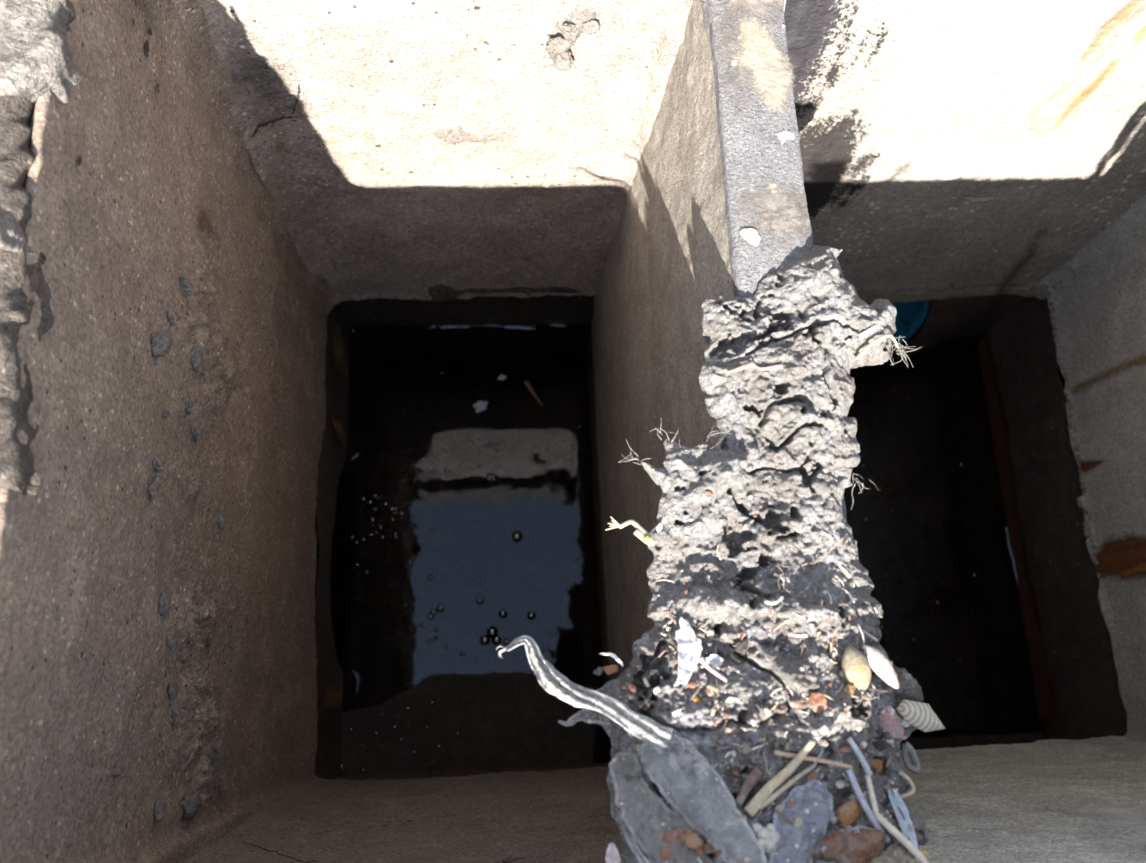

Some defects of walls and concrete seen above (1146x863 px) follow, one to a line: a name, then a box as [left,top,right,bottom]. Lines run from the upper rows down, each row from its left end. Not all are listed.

water stain [823,15,889,90]
corrosion [1032,0,1146,139]
corrosion [1094,535,1146,578]